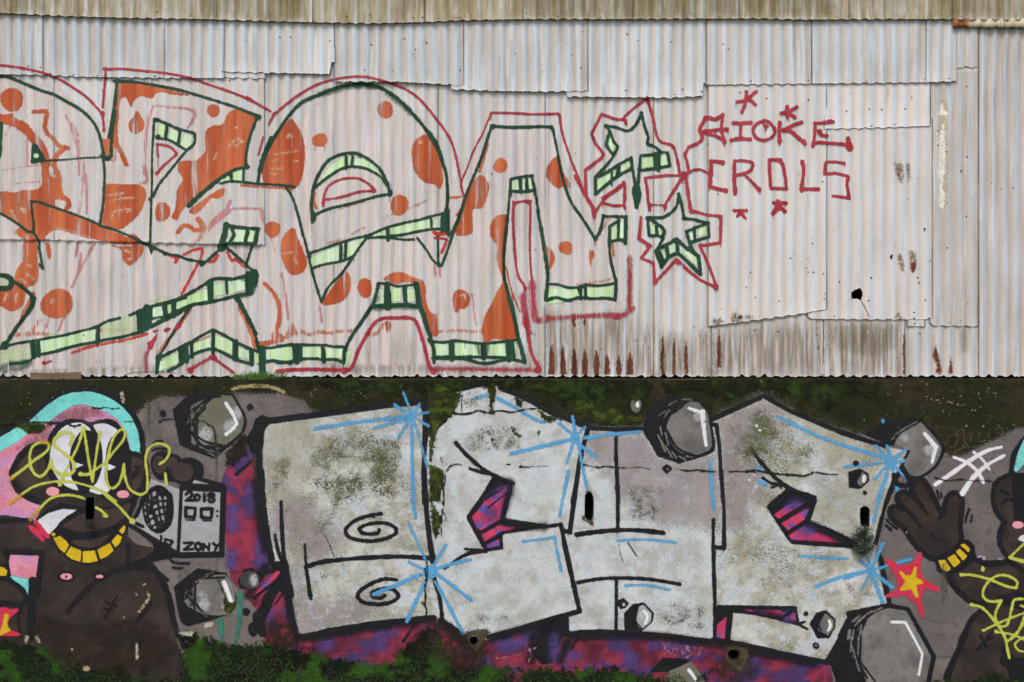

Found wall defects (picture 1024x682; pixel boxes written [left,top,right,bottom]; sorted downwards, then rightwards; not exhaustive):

rust [548,344,633,375]
rust [660,337,689,375]
rust [933,345,953,374]